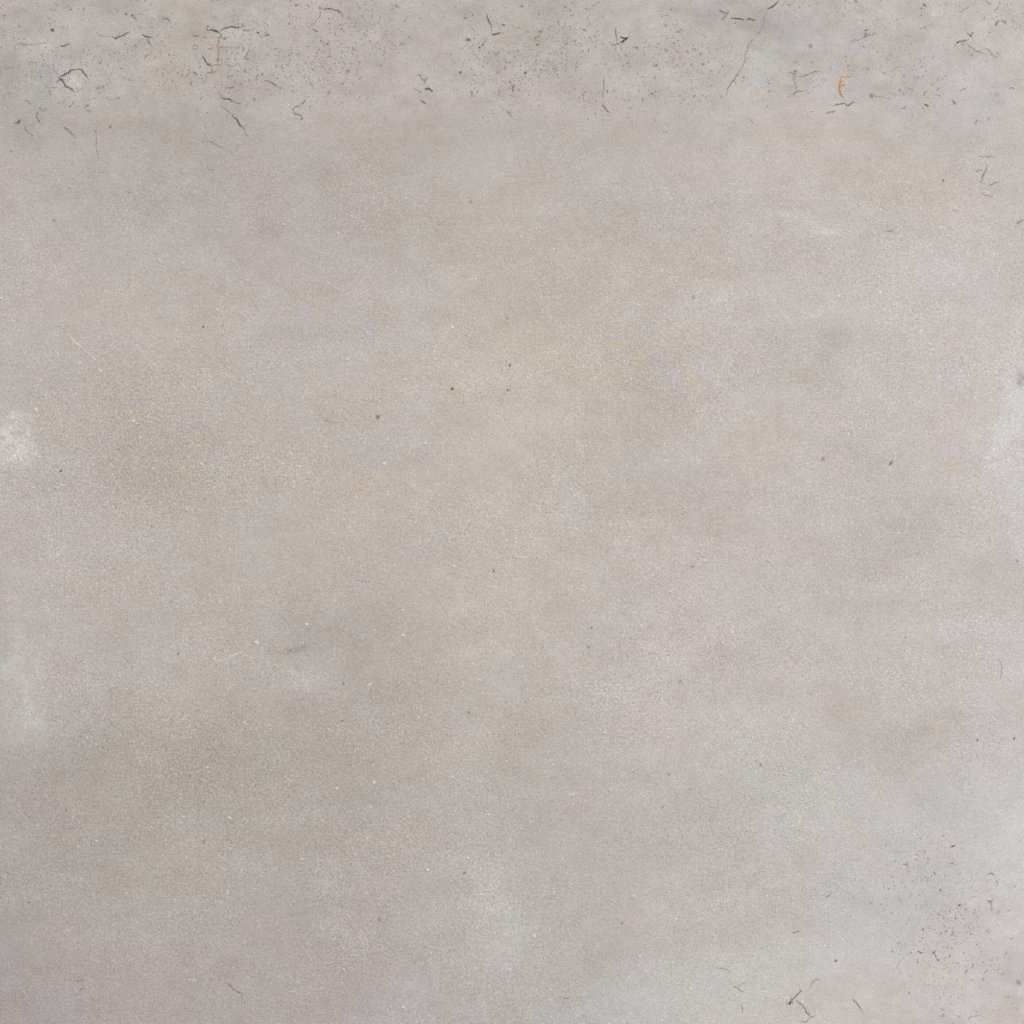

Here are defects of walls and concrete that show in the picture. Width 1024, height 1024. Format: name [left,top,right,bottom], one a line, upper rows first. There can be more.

crack [182,25,305,150]
crack [722,3,777,87]